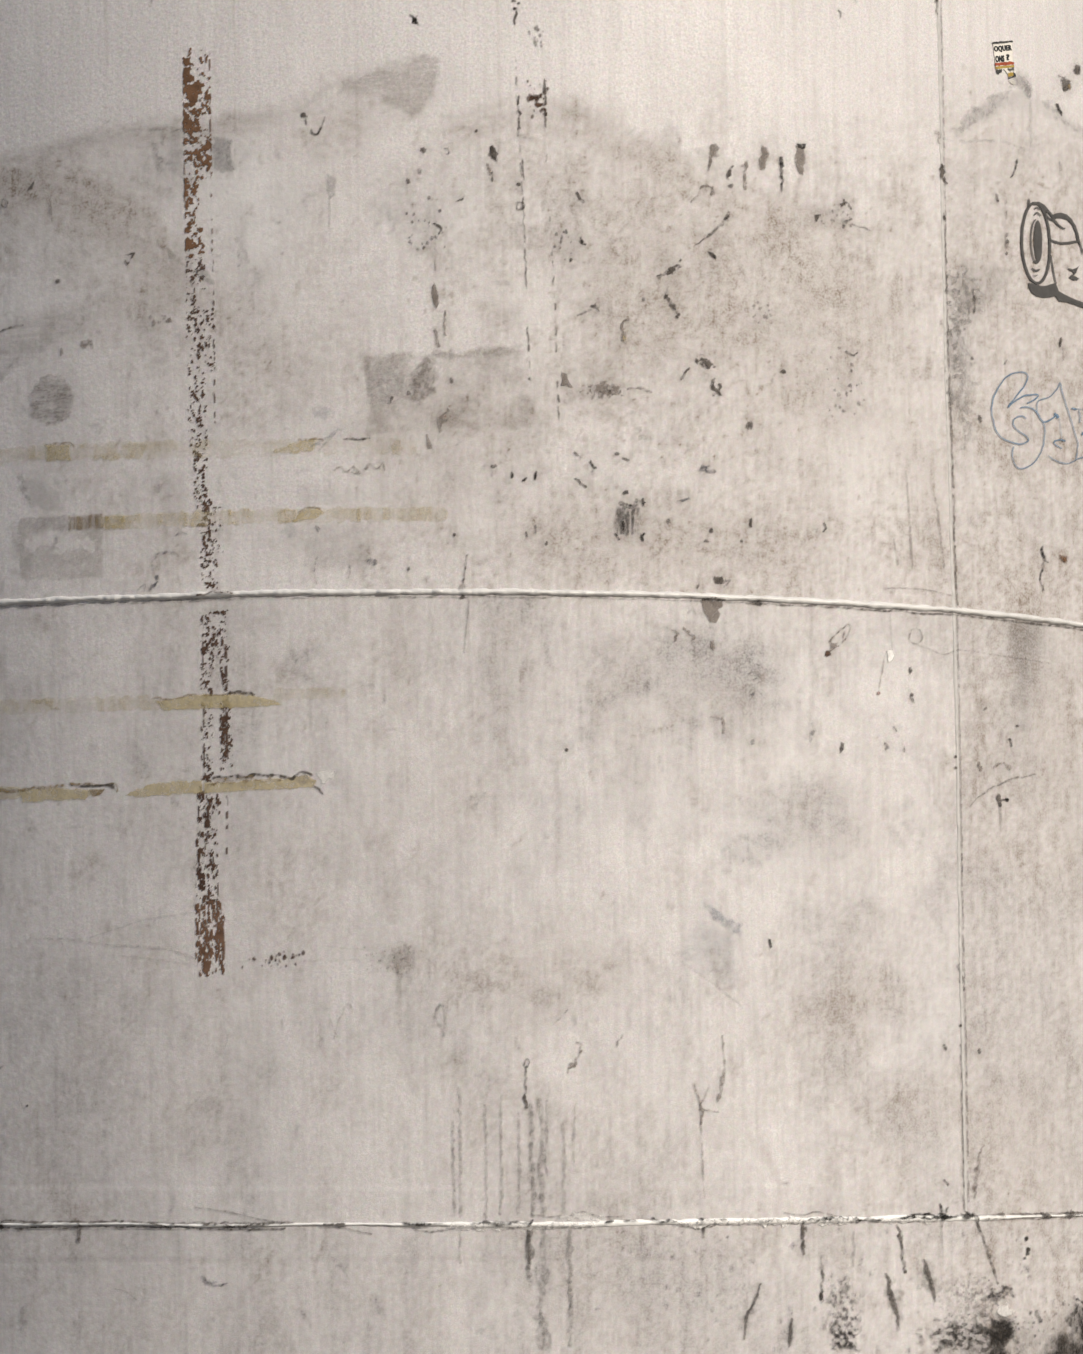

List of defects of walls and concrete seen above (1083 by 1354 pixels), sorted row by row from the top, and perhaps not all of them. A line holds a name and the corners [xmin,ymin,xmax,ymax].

corrosion [183,48,221,588]
corrosion [195,610,233,977]
leakage [831,1309,855,1348]
leakage [933,1317,1013,1354]
leakage [1054,1298,1083,1354]